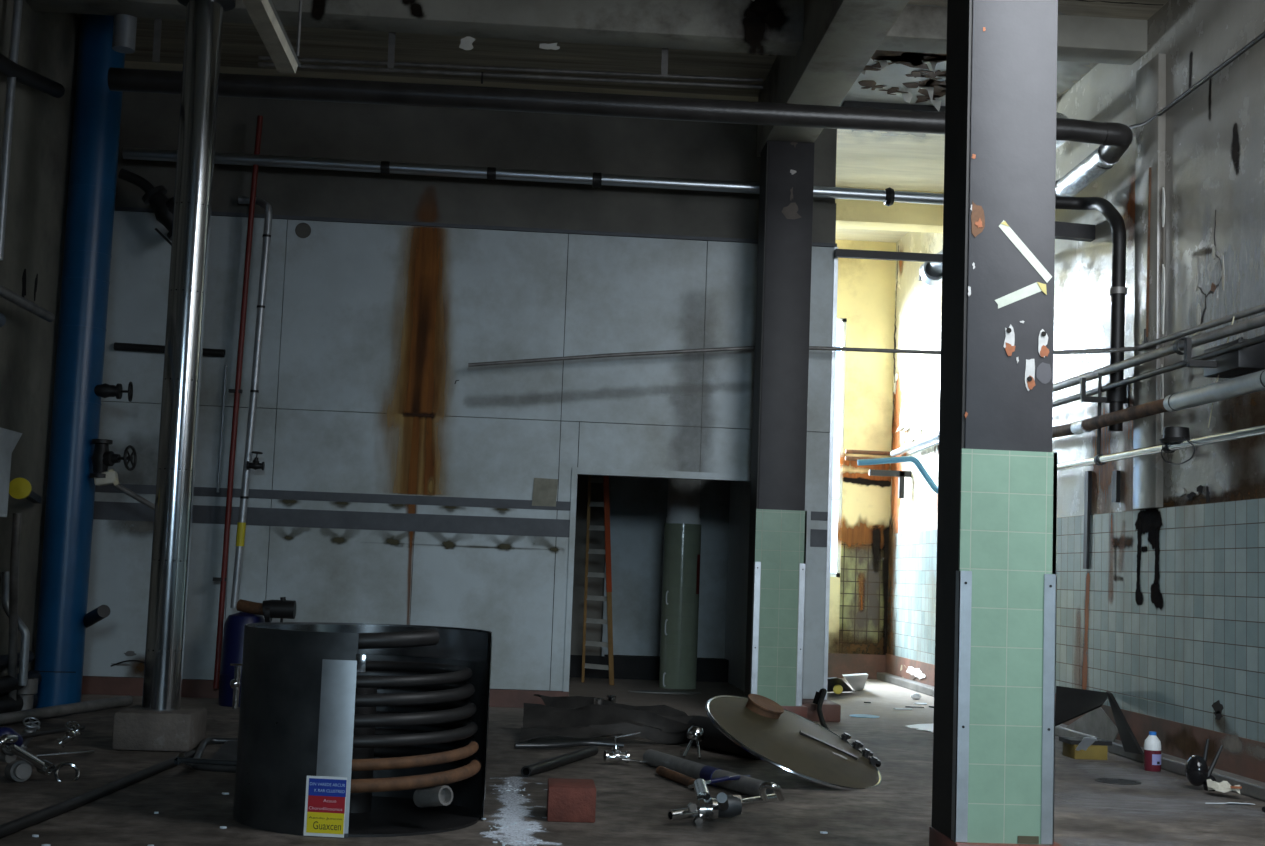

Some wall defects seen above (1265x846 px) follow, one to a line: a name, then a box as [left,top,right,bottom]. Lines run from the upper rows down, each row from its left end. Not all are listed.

peeling [858,50,946,111]
rust [383,204,447,514]
rust [839,372,908,533]
damp [828,519,896,655]